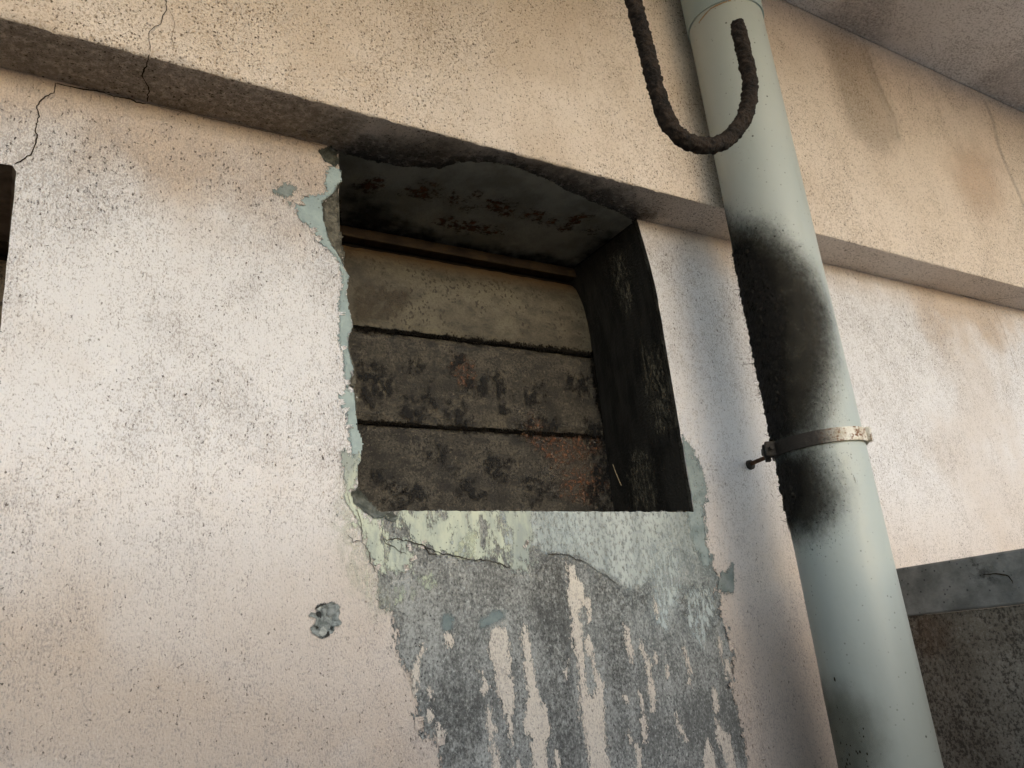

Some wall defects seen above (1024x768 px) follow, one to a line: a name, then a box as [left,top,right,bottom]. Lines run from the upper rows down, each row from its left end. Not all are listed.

crack [15,1,322,164]
rust [398,179,603,235]
peeling [272,146,750,768]